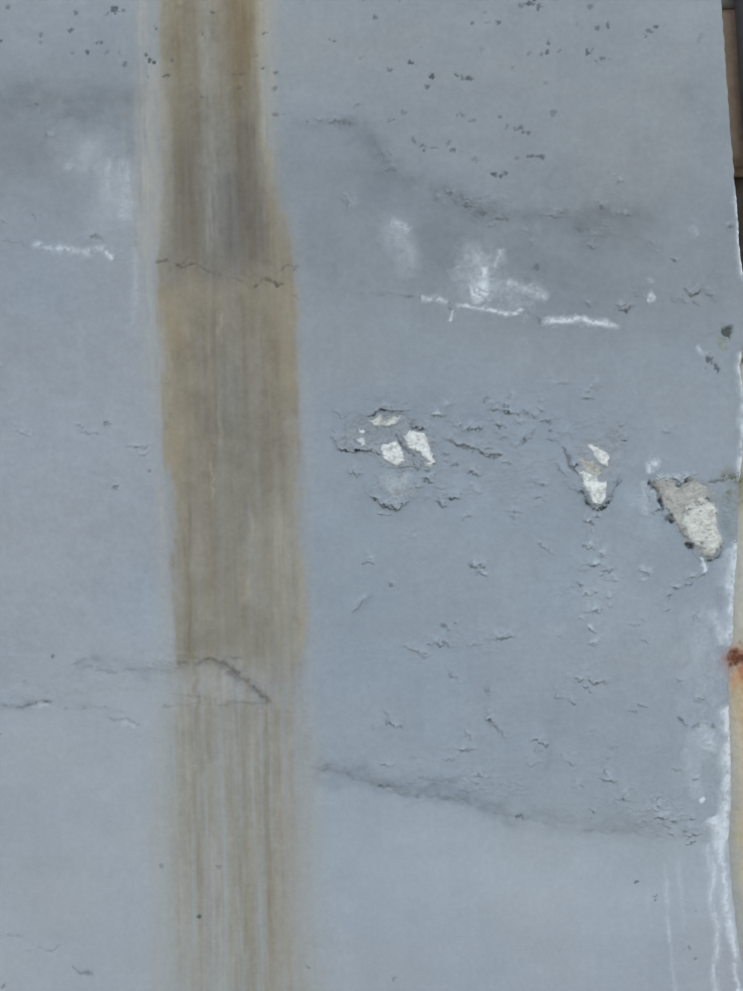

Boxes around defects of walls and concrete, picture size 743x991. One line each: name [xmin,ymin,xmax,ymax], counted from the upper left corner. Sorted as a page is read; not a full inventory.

efflorescence [375,210,425,281]
leakage [446,235,555,324]
leakage [729,181,743,288]
spalling [326,393,515,527]
spalling [545,419,630,522]
spalling [636,453,739,574]
leakage [731,349,743,464]
crack [0,693,141,730]
crack [67,647,646,838]
leakage [672,536,743,991]
rust [702,625,743,768]